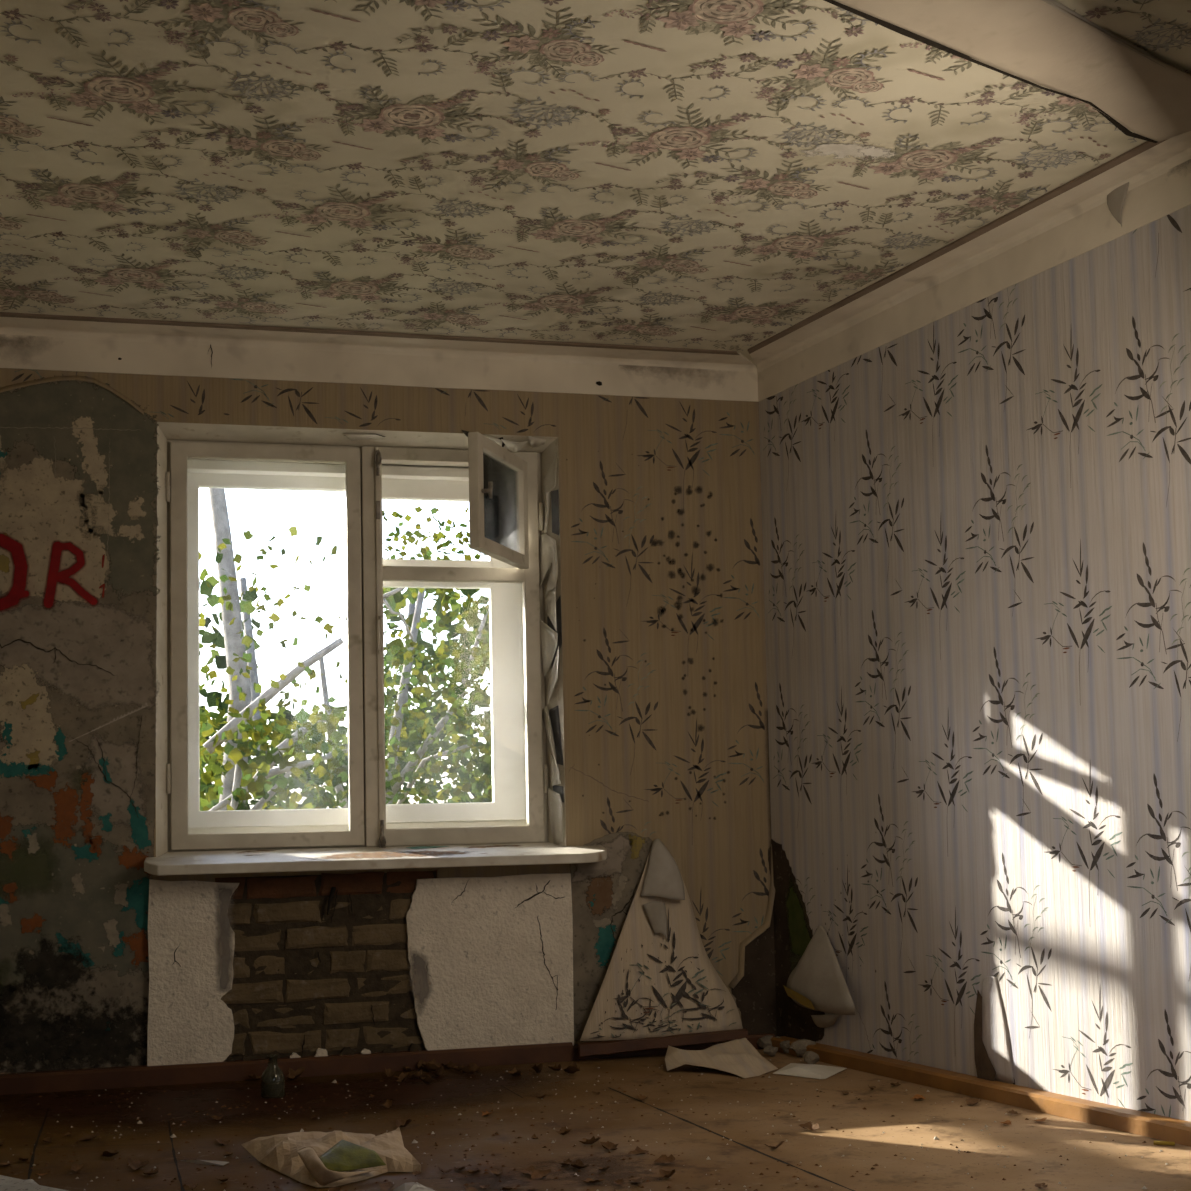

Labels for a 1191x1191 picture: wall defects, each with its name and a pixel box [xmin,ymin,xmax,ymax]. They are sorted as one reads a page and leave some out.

crack [0,639,115,676]
peeling [0,375,685,1073]
mould [0,939,148,1073]